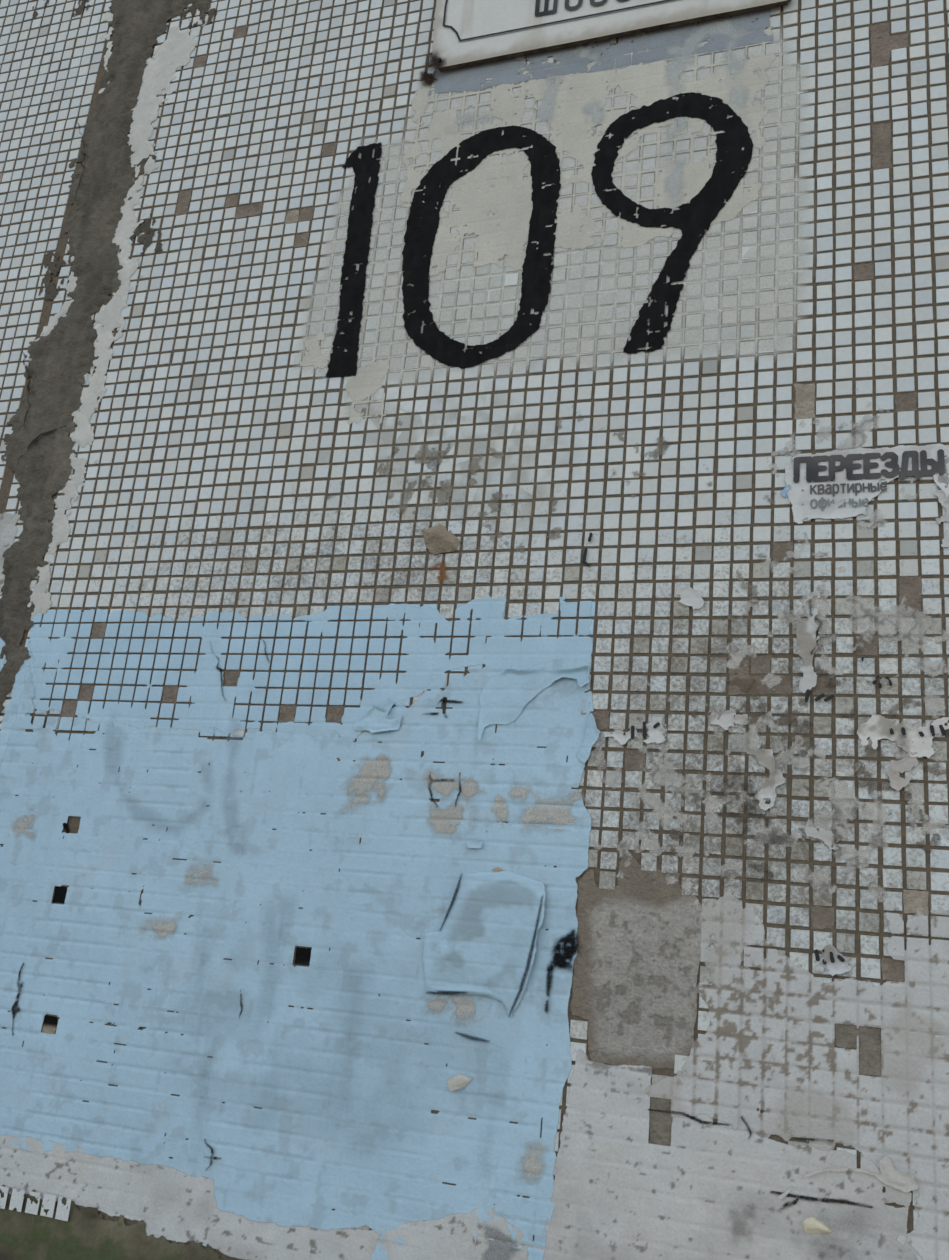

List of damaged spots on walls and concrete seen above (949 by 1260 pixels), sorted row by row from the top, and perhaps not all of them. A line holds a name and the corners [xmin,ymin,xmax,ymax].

crack [0,0,217,723]
spalling [899,576,922,616]
spalling [728,654,792,695]
peeling [326,698,402,733]
peeling [347,755,391,808]
peeling [426,771,482,834]
peeling [477,665,590,740]
peeling [492,786,581,830]
peeling [576,710,610,763]
spalling [624,750,646,771]
spalling [570,853,706,1069]
crack [11,963,24,1034]